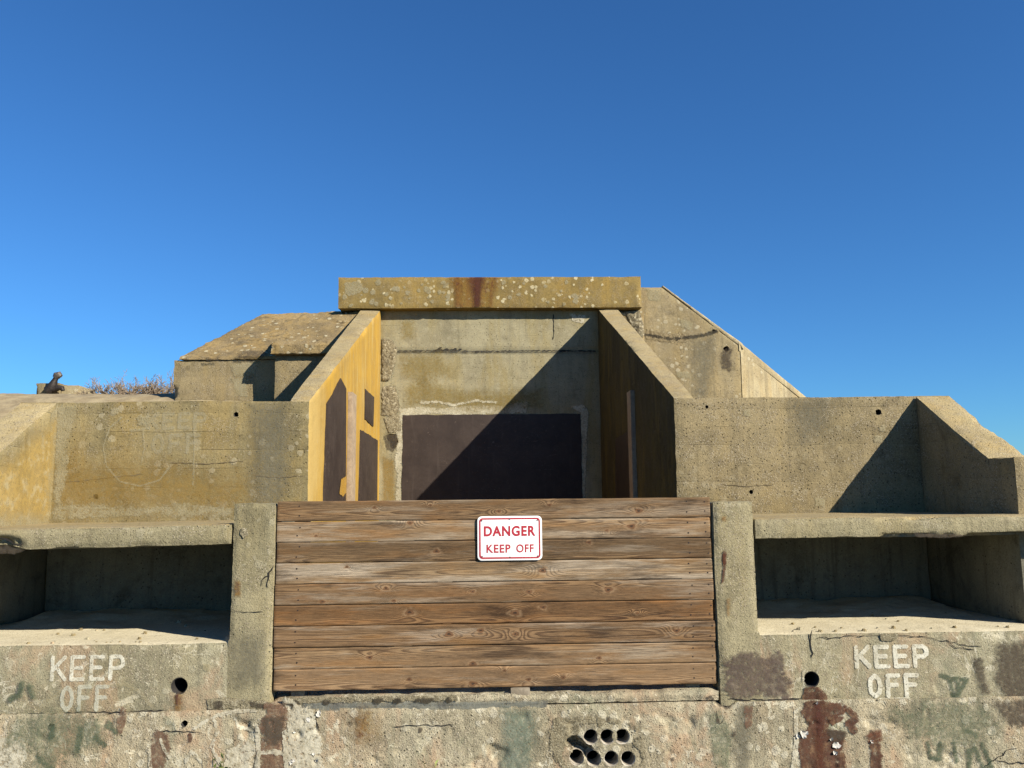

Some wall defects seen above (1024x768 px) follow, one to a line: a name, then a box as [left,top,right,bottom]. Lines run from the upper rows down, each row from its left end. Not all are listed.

corrosion [451,277,497,307]
spalling [381,338,401,451]
damp [722,349,732,372]
crack [810,631,981,657]
corrosion [796,687,883,768]
damp [894,640,1024,749]